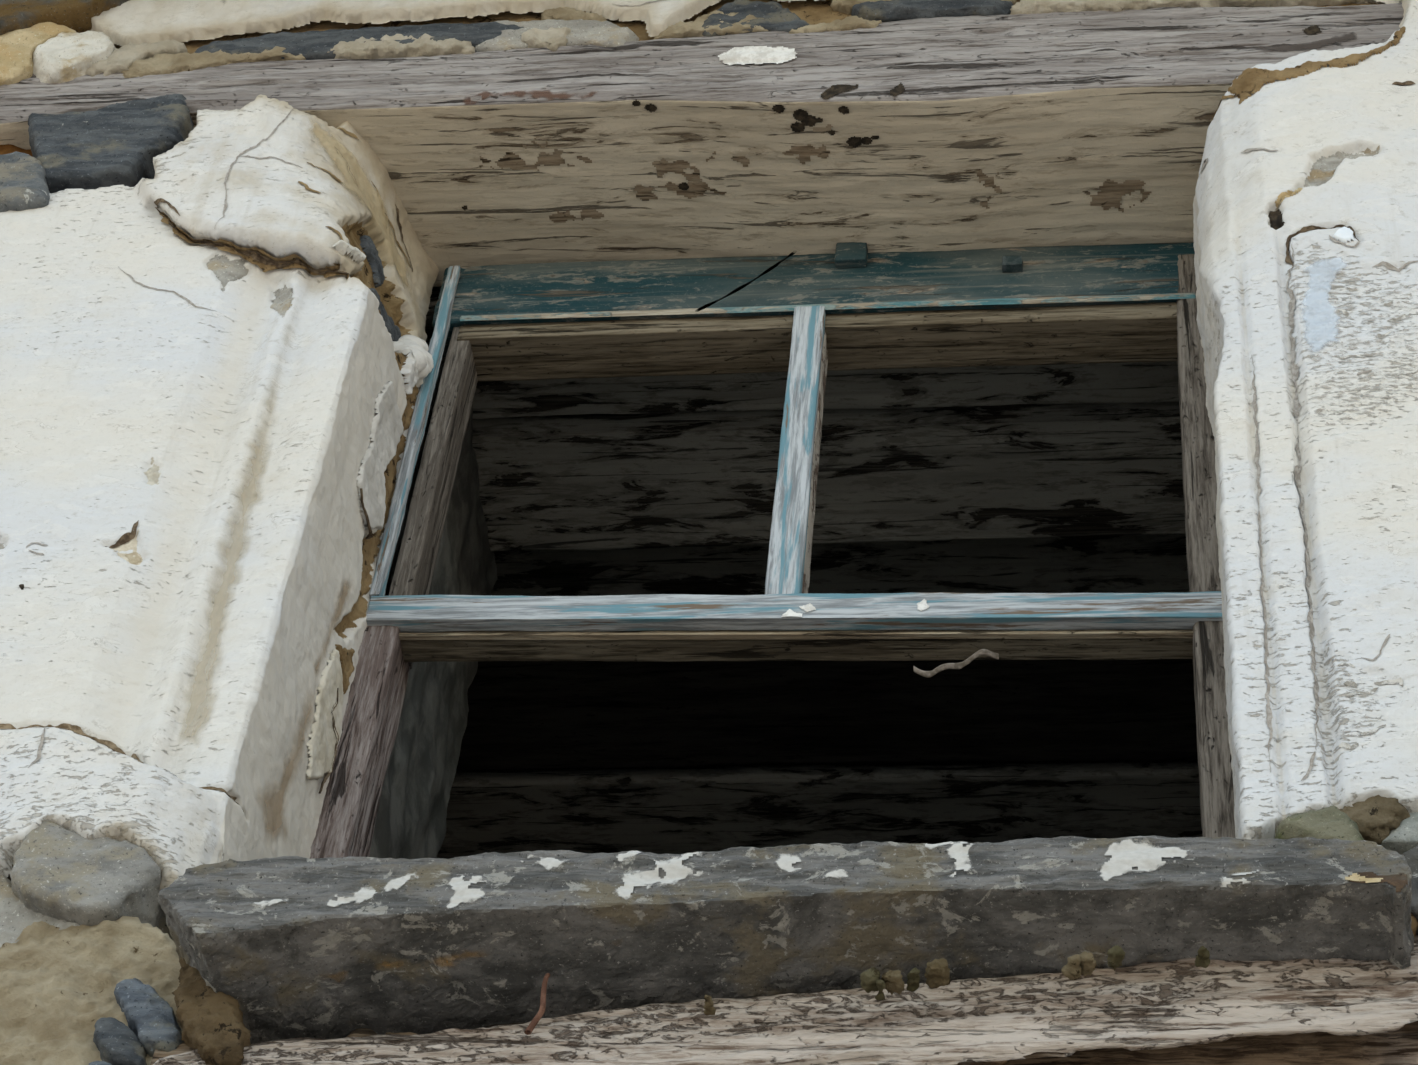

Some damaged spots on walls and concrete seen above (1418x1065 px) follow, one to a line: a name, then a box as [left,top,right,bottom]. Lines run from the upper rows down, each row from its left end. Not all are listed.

peeling [718,46,797,65]
flaking render [1212,26,1406,120]
crack [154,108,349,278]
flaking render [1268,145,1380,230]
flaking render [105,520,143,565]
flaking render [306,221,434,794]
crack [0,723,143,767]
crack [199,786,244,812]
flaking render [0,874,80,947]
spalling [89,978,184,1065]